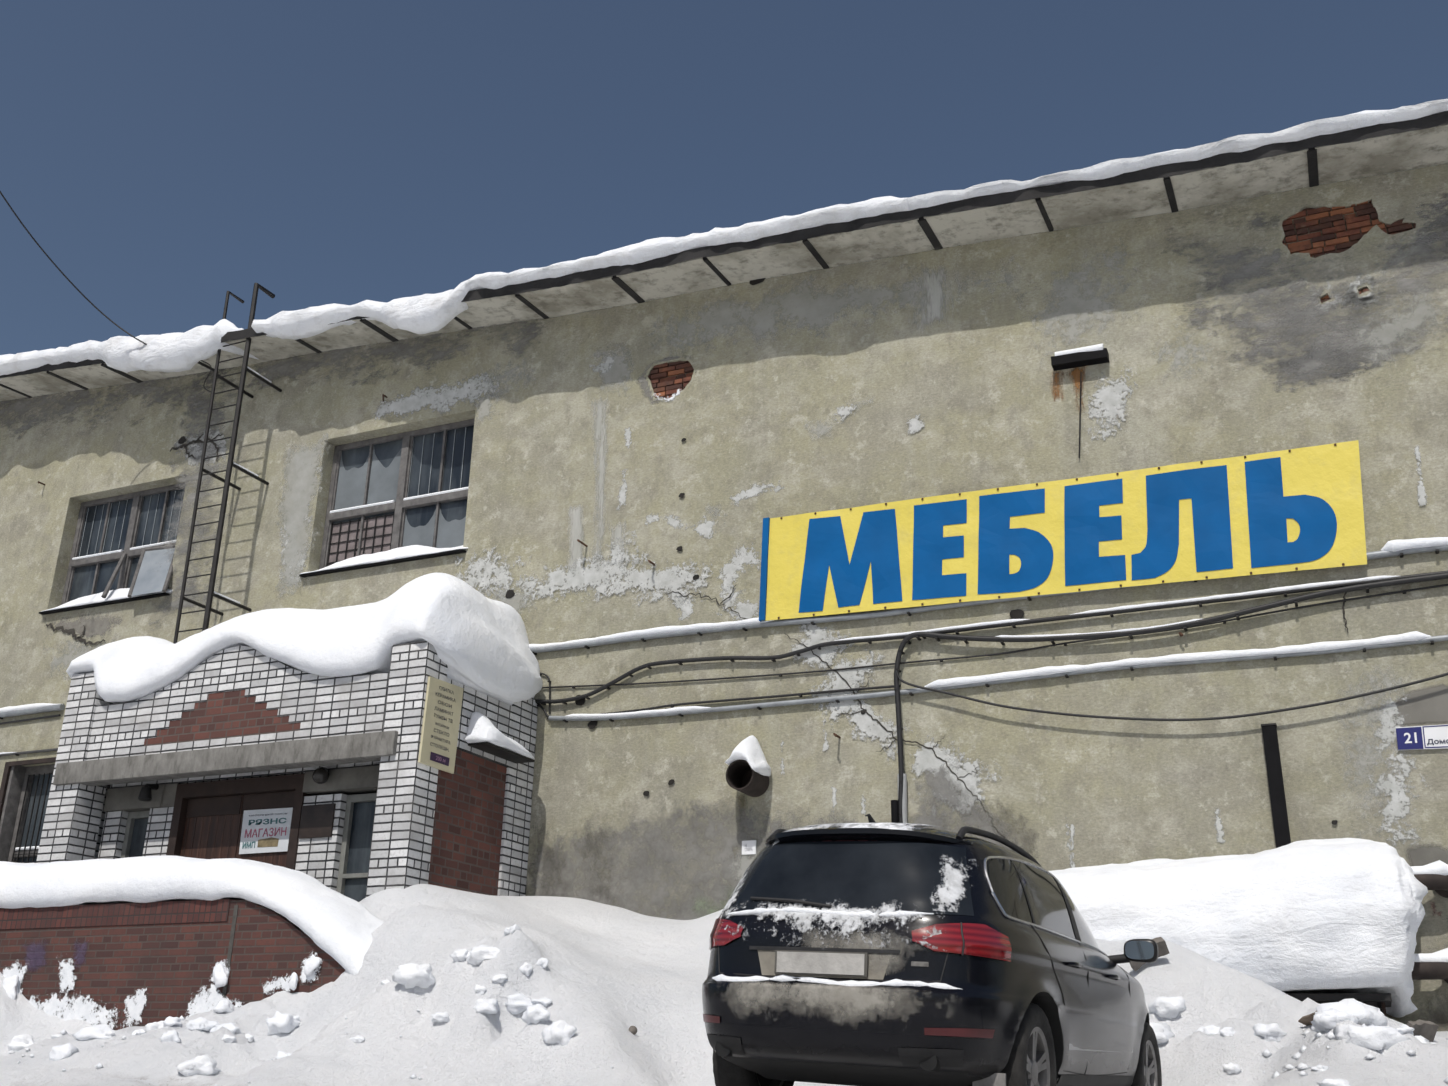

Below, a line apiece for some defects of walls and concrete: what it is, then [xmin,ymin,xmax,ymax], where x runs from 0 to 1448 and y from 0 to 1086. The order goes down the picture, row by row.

peeling [374,361,530,421]
flaking render [639,356,696,403]
corrosion [1052,367,1085,403]
peeling [1035,251,1126,343]
peeling [1081,365,1136,440]
leakage [1232,293,1437,384]
flaking render [1282,200,1431,317]
peeling [455,483,783,620]
crack [667,584,1015,852]
peeling [1350,675,1425,845]